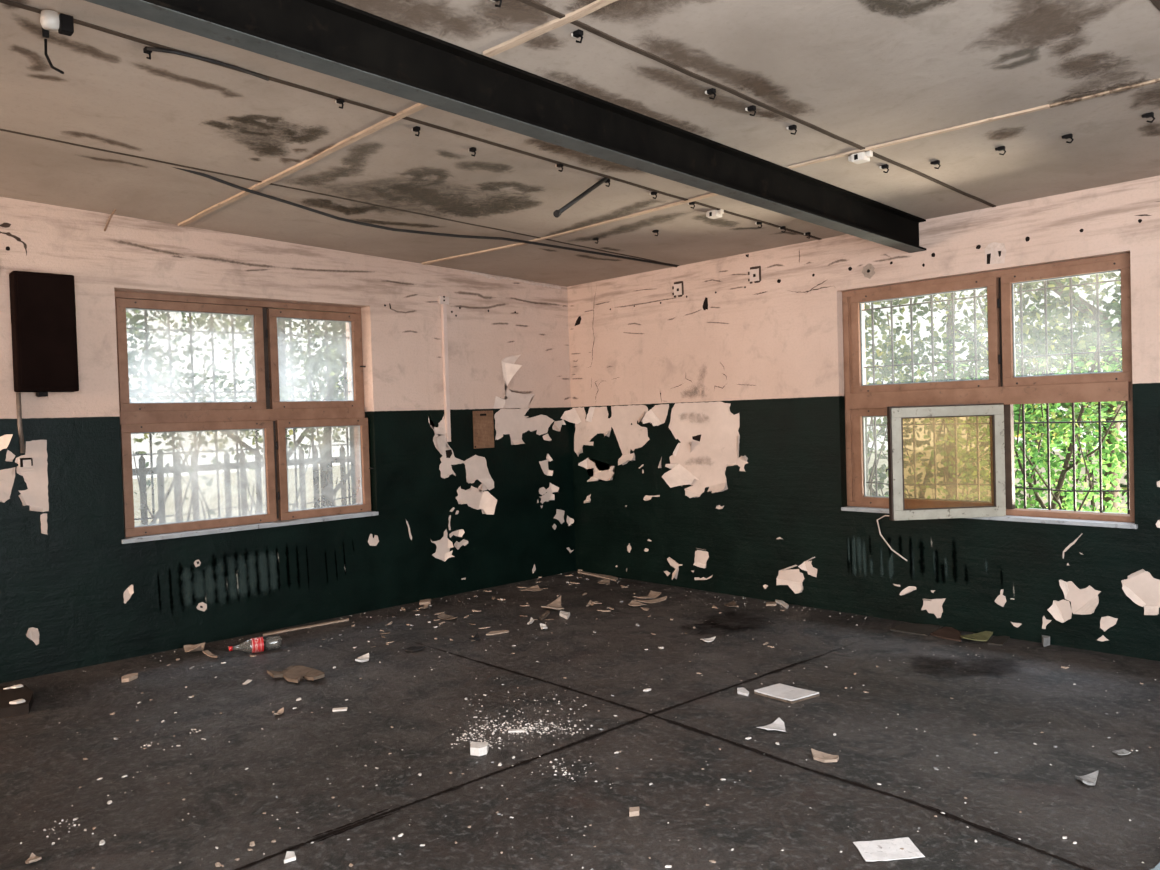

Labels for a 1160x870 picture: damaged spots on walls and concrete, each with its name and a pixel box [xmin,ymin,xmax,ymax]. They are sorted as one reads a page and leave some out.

leakage [583,0,679,17]
leakage [862,0,944,16]
leakage [140,65,237,97]
leakage [995,0,1160,107]
leakage [206,115,333,162]
leakage [296,144,541,228]
peeling [0,434,49,535]
peeling [428,416,497,562]
peeling [493,396,748,530]
peeling [763,557,817,594]
peeling [1042,579,1118,641]
peeling [1121,569,1160,615]